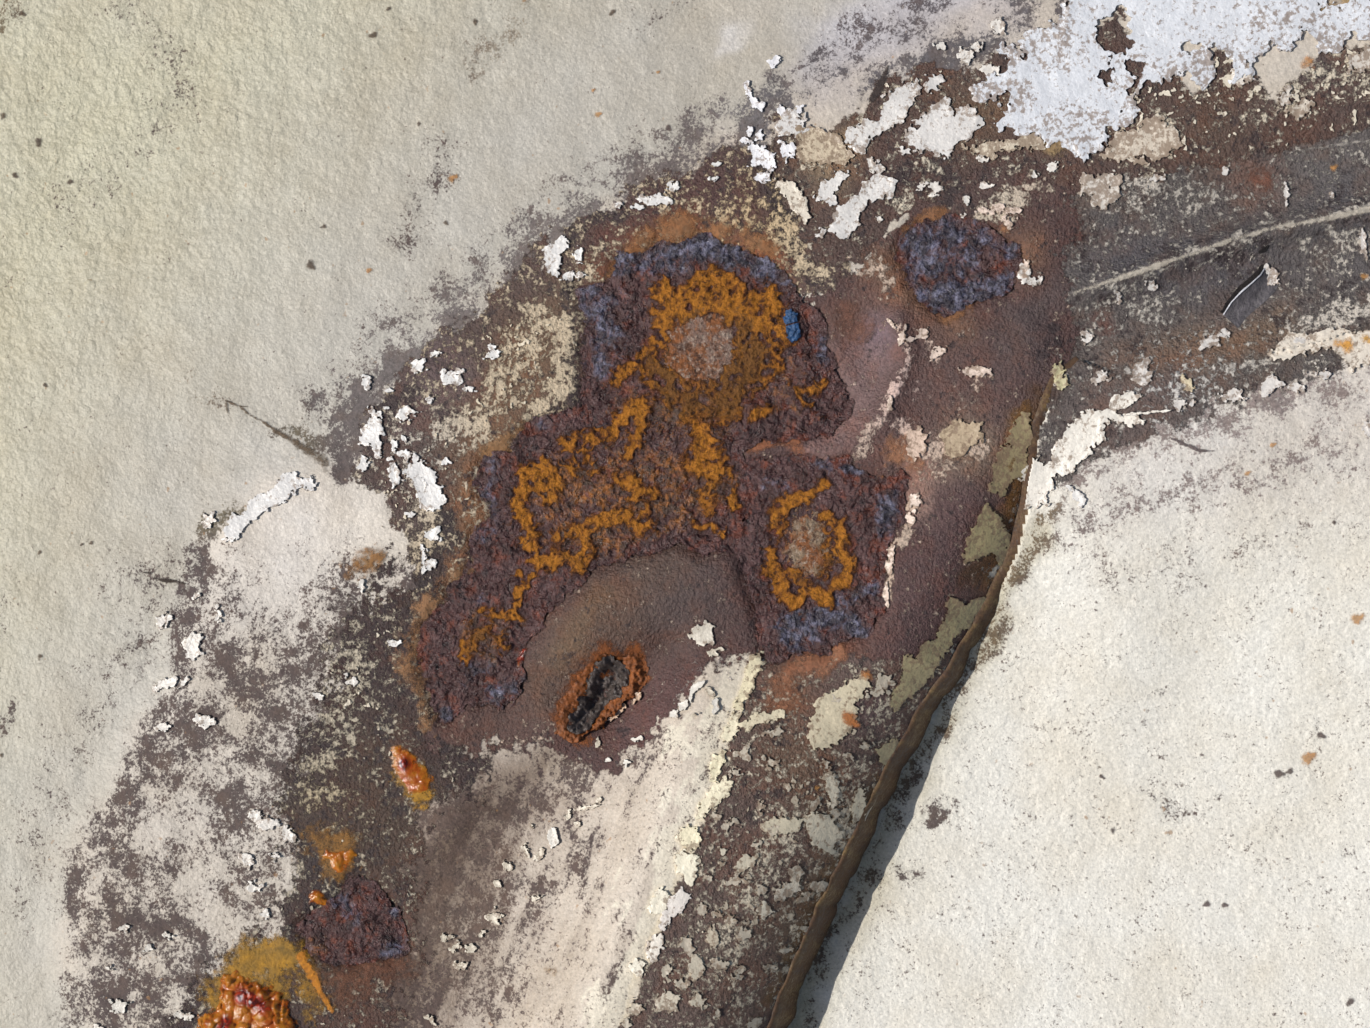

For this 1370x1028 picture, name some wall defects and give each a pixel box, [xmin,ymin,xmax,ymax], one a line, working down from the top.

peeling [766,55,781,69]
peeling [777,140,796,164]
rust [893,207,1022,325]
peeling [1017,262,1043,287]
crack [1220,245,1280,328]
peeling [360,374,372,391]
rust [397,208,924,733]
peeling [1065,485,1087,508]
rust [390,745,434,810]
rust [196,828,410,1028]